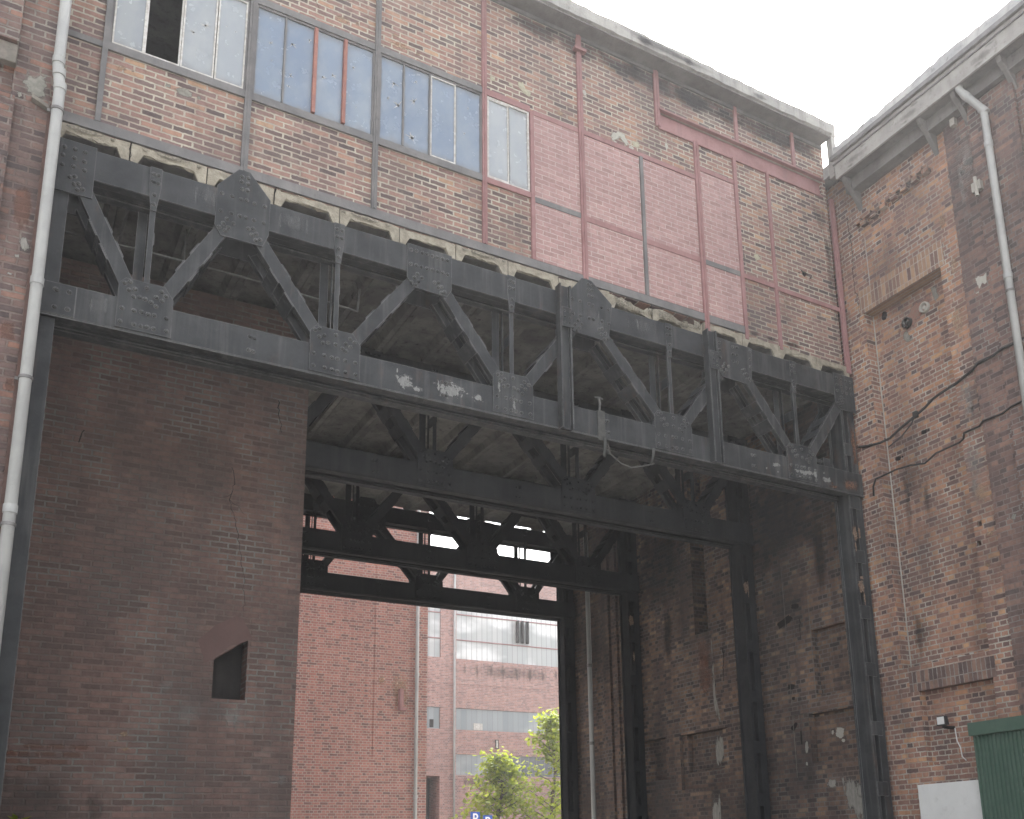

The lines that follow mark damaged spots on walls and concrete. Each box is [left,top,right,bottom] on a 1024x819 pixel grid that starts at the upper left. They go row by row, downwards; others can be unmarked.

spalling [617,297,701,330]